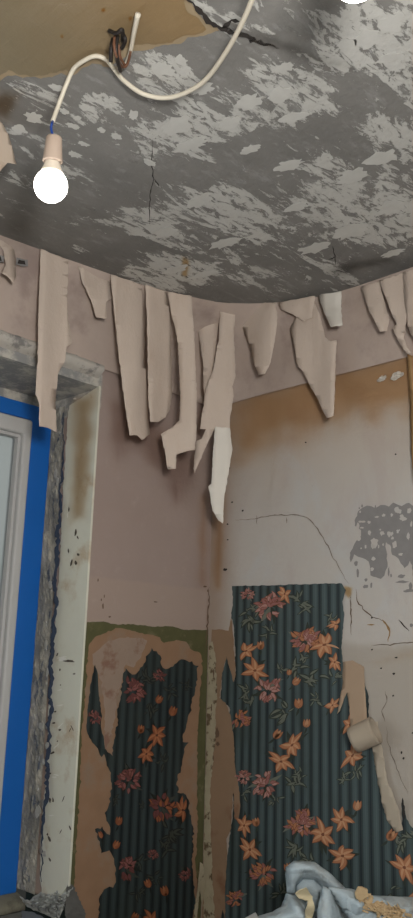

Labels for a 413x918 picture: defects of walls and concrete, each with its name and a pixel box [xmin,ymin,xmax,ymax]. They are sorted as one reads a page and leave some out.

peeling [0,0,413,523]
spalling [16,249,73,918]
spalling [203,641,220,918]
crack [240,514,413,646]
peeling [337,660,383,753]
spalling [350,503,413,592]